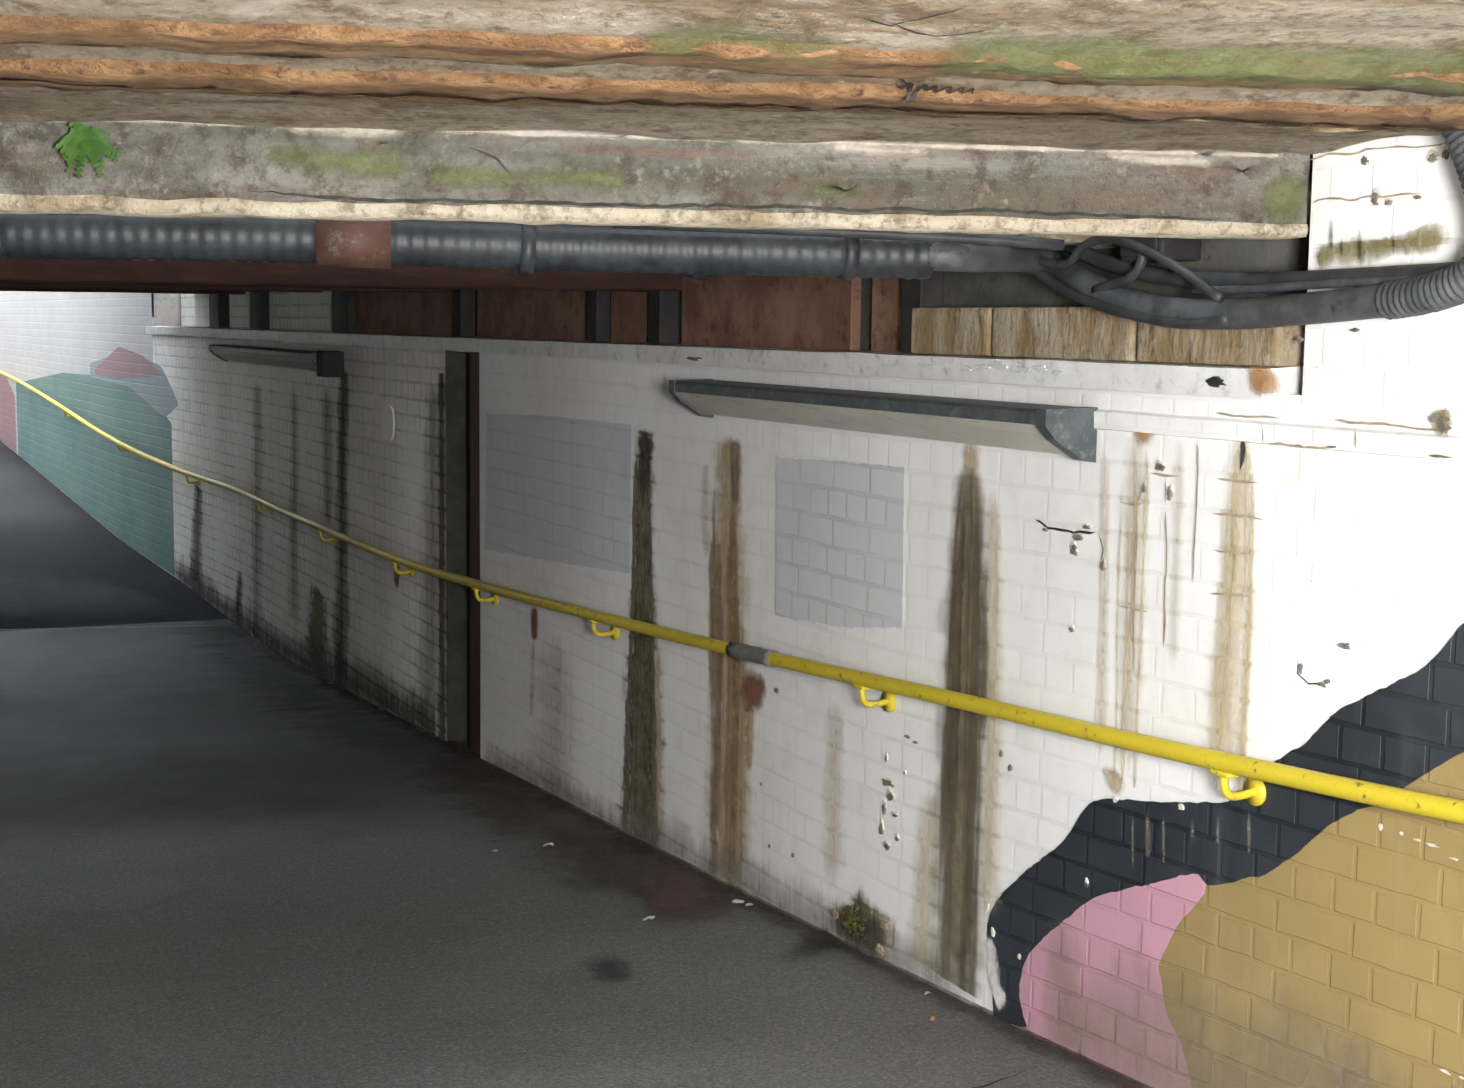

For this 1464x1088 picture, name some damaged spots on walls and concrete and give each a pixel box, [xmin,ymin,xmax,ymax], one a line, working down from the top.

damp [190,484,203,578]
damp [236,511,260,619]
damp [291,373,349,668]
damp [424,373,448,742]
damp [623,433,663,848]
corrosion [709,442,779,885]
peeling [879,753,907,850]
damp [918,448,998,995]
crack [973,1066,1039,1088]